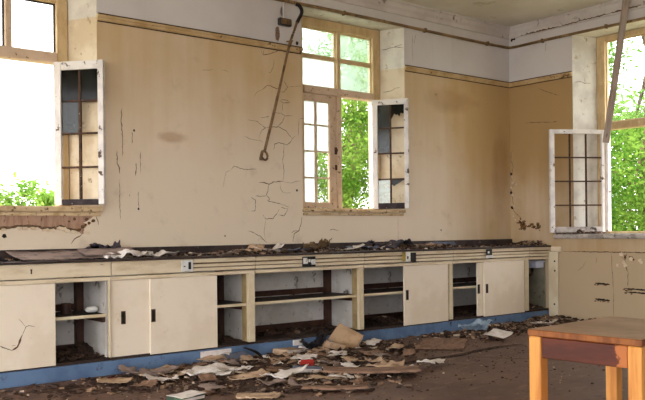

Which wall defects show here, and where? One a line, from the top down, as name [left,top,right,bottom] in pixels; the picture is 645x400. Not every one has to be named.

flaking render [0,216,95,238]
crack [223,51,303,243]